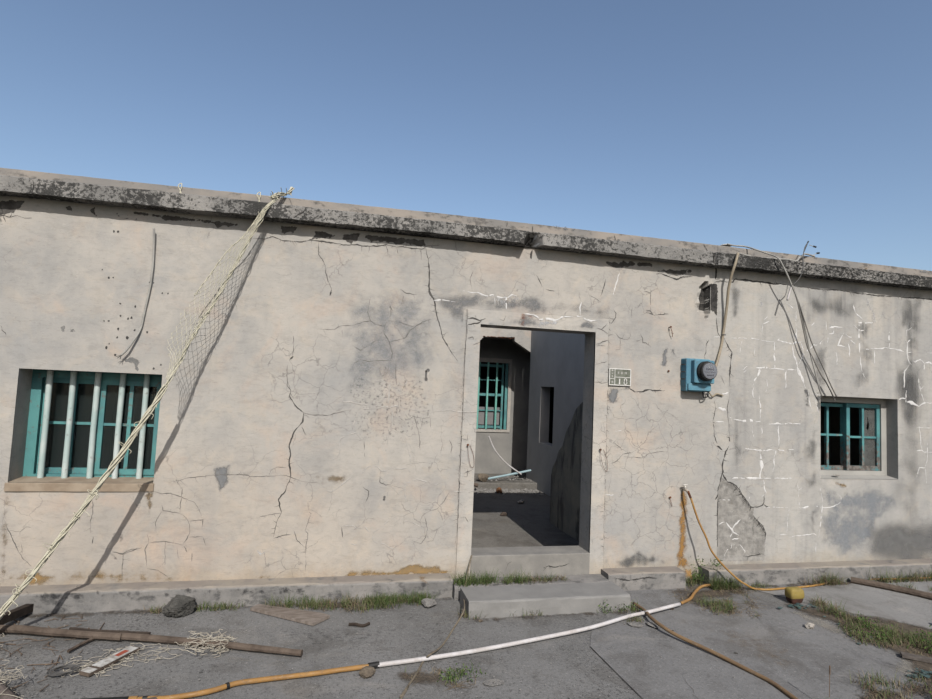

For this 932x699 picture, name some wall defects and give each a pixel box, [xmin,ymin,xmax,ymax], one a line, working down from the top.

flaking render [0,200,24,215]
flaking render [312,231,426,247]
flaking render [606,260,693,280]
crack [114,337,347,577]
crack [253,235,506,544]
crack [591,279,668,553]
crack [704,318,734,500]
leakage [732,423,800,508]
leakage [716,304,932,437]
rust [677,491,691,576]
spalling [714,478,766,561]
leakage [781,489,932,559]